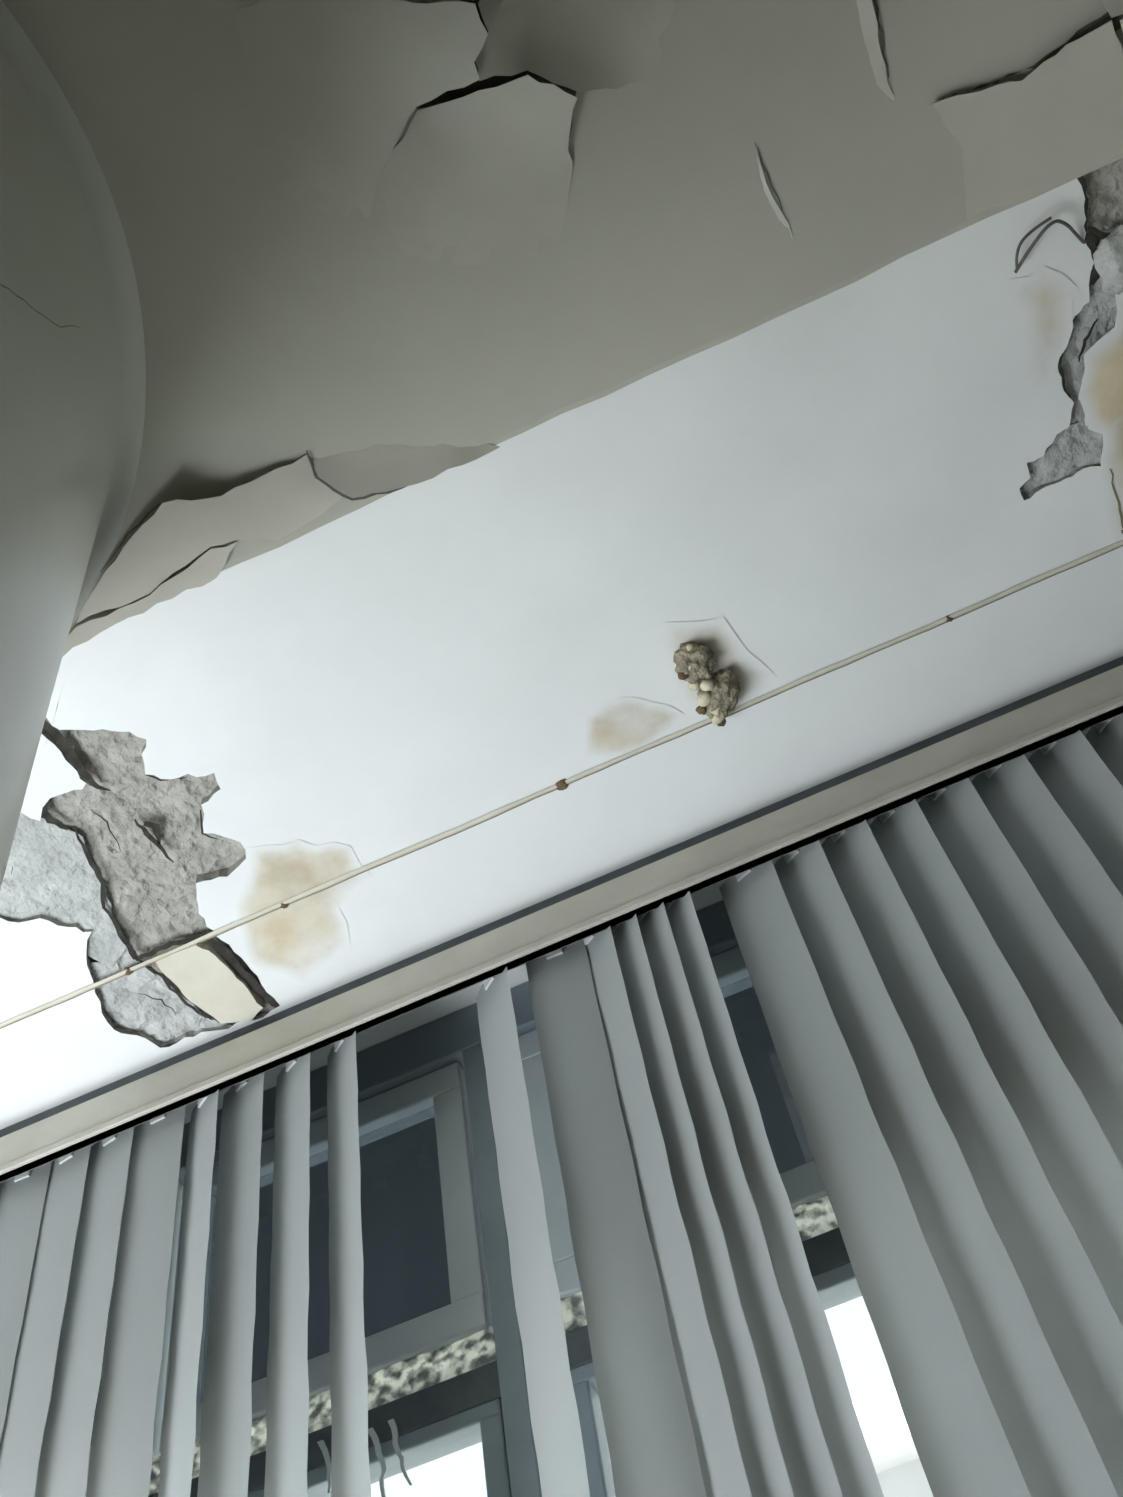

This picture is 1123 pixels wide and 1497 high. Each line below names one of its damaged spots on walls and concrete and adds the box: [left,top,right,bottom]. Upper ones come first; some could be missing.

peeling [63,443,499,656]
peeling [931,0,1123,500]
leakage [1009,267,1077,396]
leakage [1078,292,1123,554]
spalling [0,718,280,1048]
crack [0,469,1123,1029]